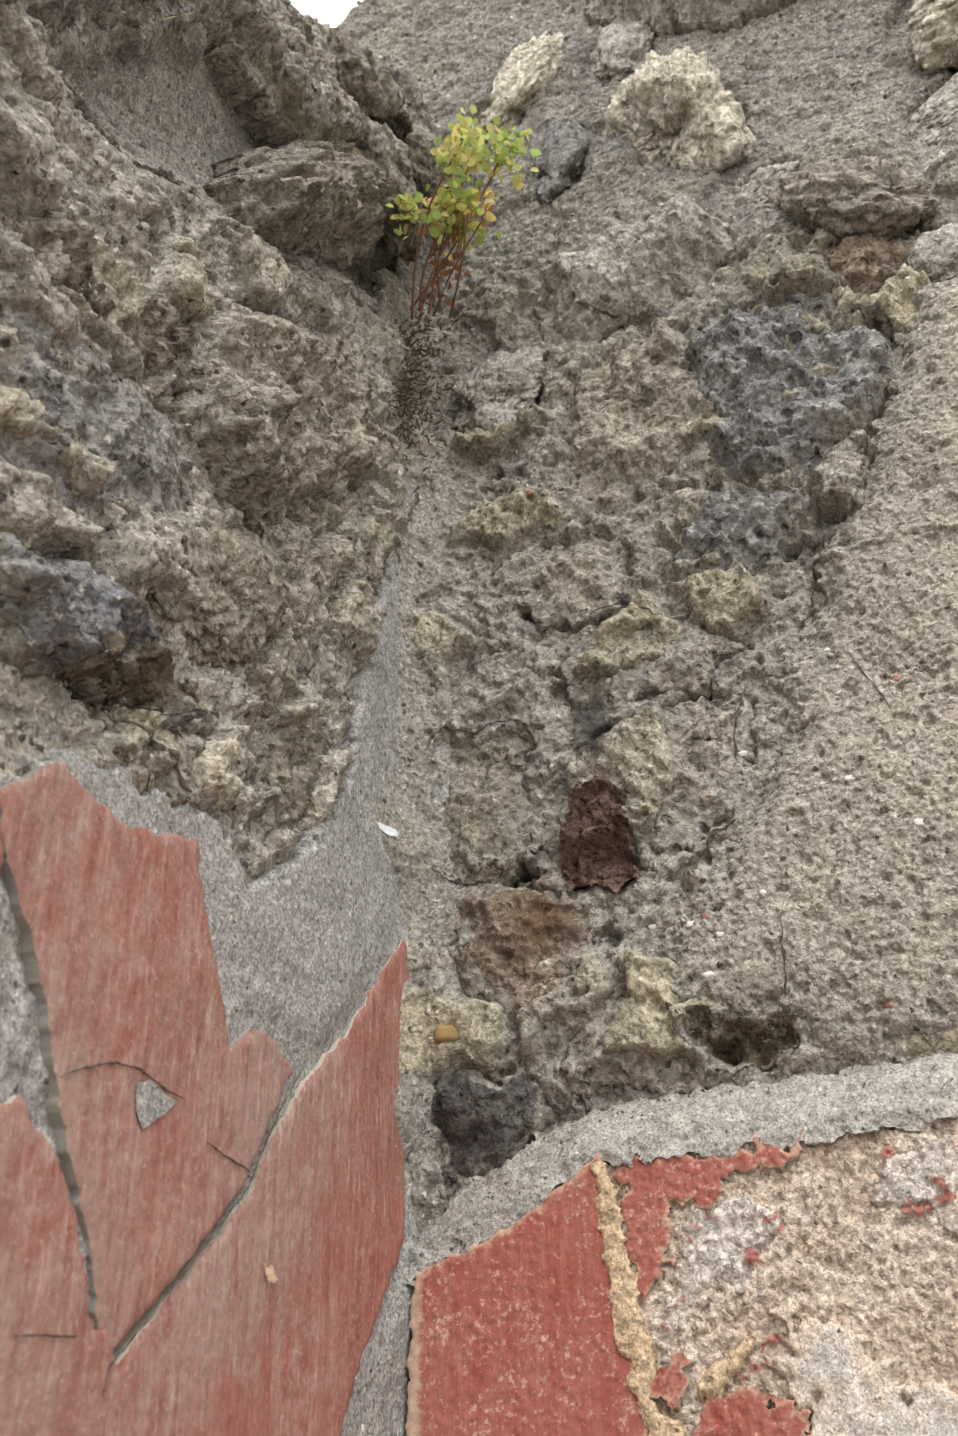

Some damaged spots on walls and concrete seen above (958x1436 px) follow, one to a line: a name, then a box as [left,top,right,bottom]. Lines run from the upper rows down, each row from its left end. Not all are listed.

crack [62,1061,184,1099]
spalling [136,1080,177,1129]
crack [102,1072,301,1397]
spalling [870,1135,958,1237]
crack [15,1332,78,1340]
spalling [649,1193,790,1414]
peeling [691,1334,813,1436]